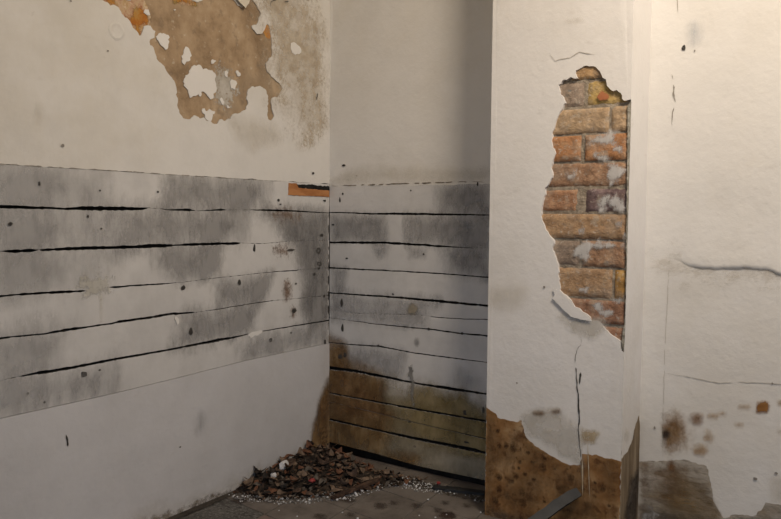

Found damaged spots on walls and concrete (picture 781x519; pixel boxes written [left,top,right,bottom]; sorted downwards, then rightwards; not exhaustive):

peeling [103,0,324,146]
water stain [0,212,53,250]
water stain [6,170,52,201]
crack [0,163,269,181]
water stain [123,176,260,280]
crack [324,225,332,329]
water stain [405,186,490,269]
flaking render [542,66,631,352]
crack [663,260,781,405]
water stain [355,350,486,480]
crack [575,348,590,496]
peeling [485,407,781,519]